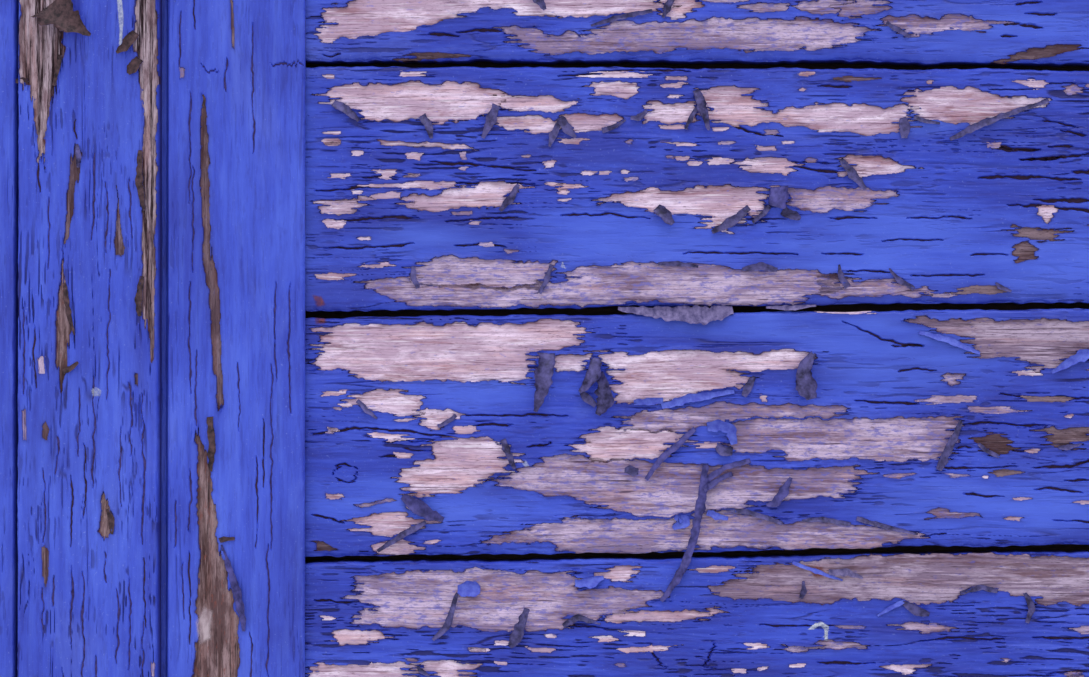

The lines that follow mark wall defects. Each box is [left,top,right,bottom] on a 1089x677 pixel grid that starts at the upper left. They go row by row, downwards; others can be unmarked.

peeling [15,0,91,169]
peeling [116,0,159,363]
peeling [312,52,1051,234]
peeling [1007,205,1073,263]
peeling [994,44,1089,64]
peeling [1062,84,1089,95]
peeling [192,94,246,677]
peeling [307,242,1089,677]